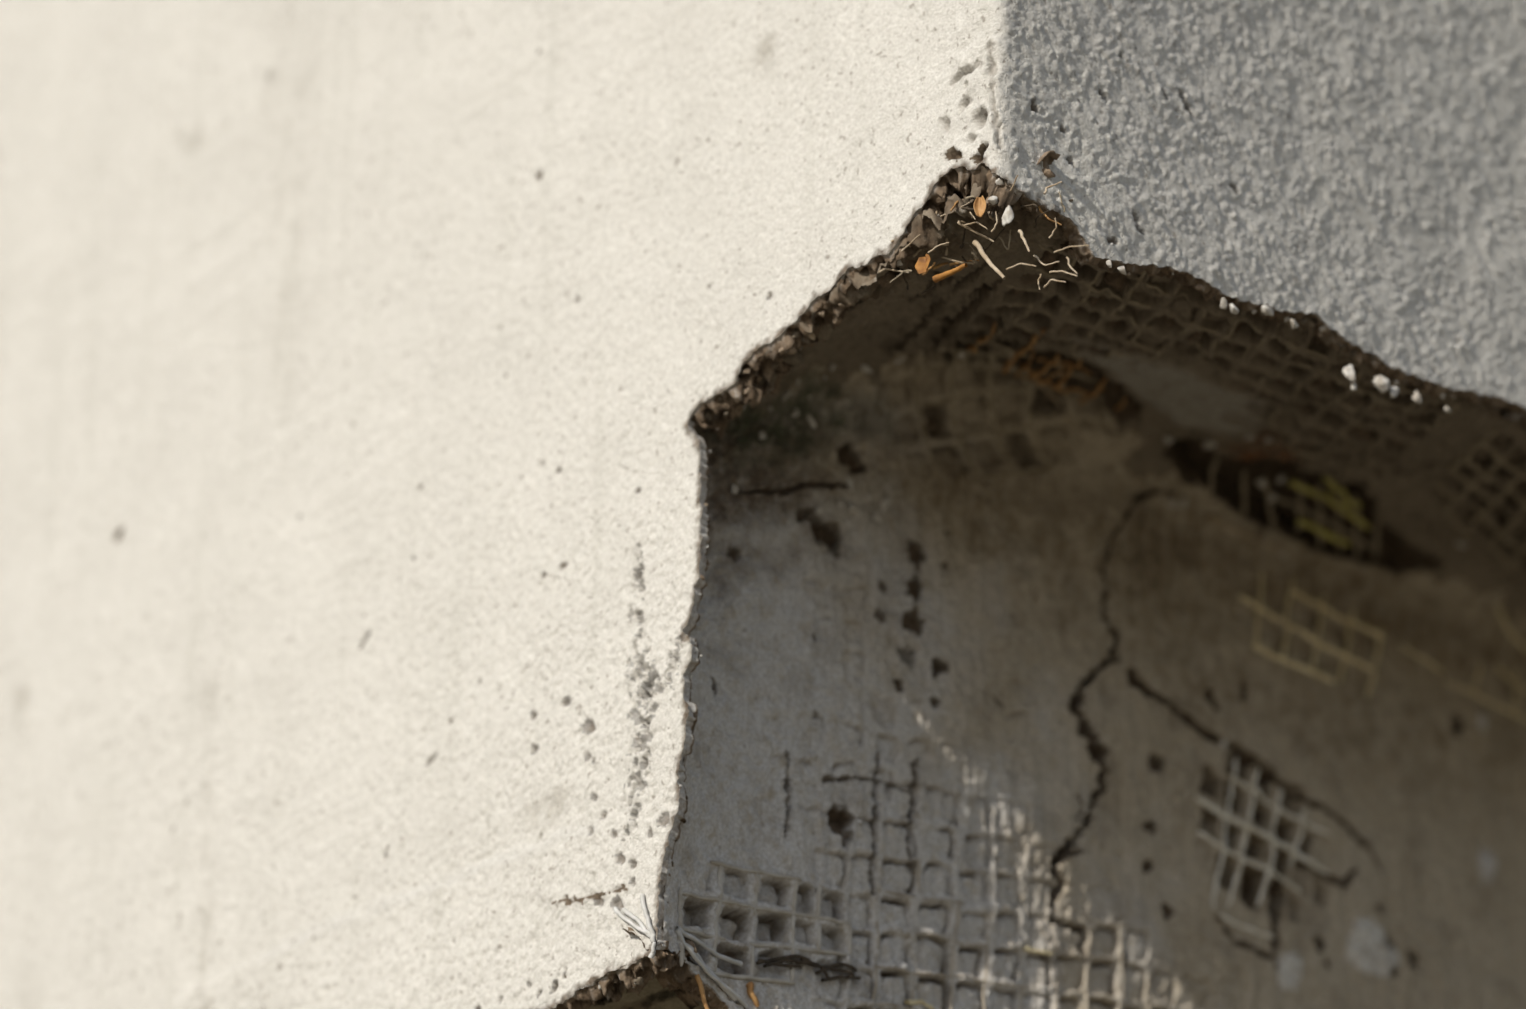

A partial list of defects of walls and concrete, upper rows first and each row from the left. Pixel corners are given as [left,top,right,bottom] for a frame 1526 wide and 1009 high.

spalling [1037,150,1077,178]
flaking render [526,163,1526,1009]
crack [1048,489,1385,968]